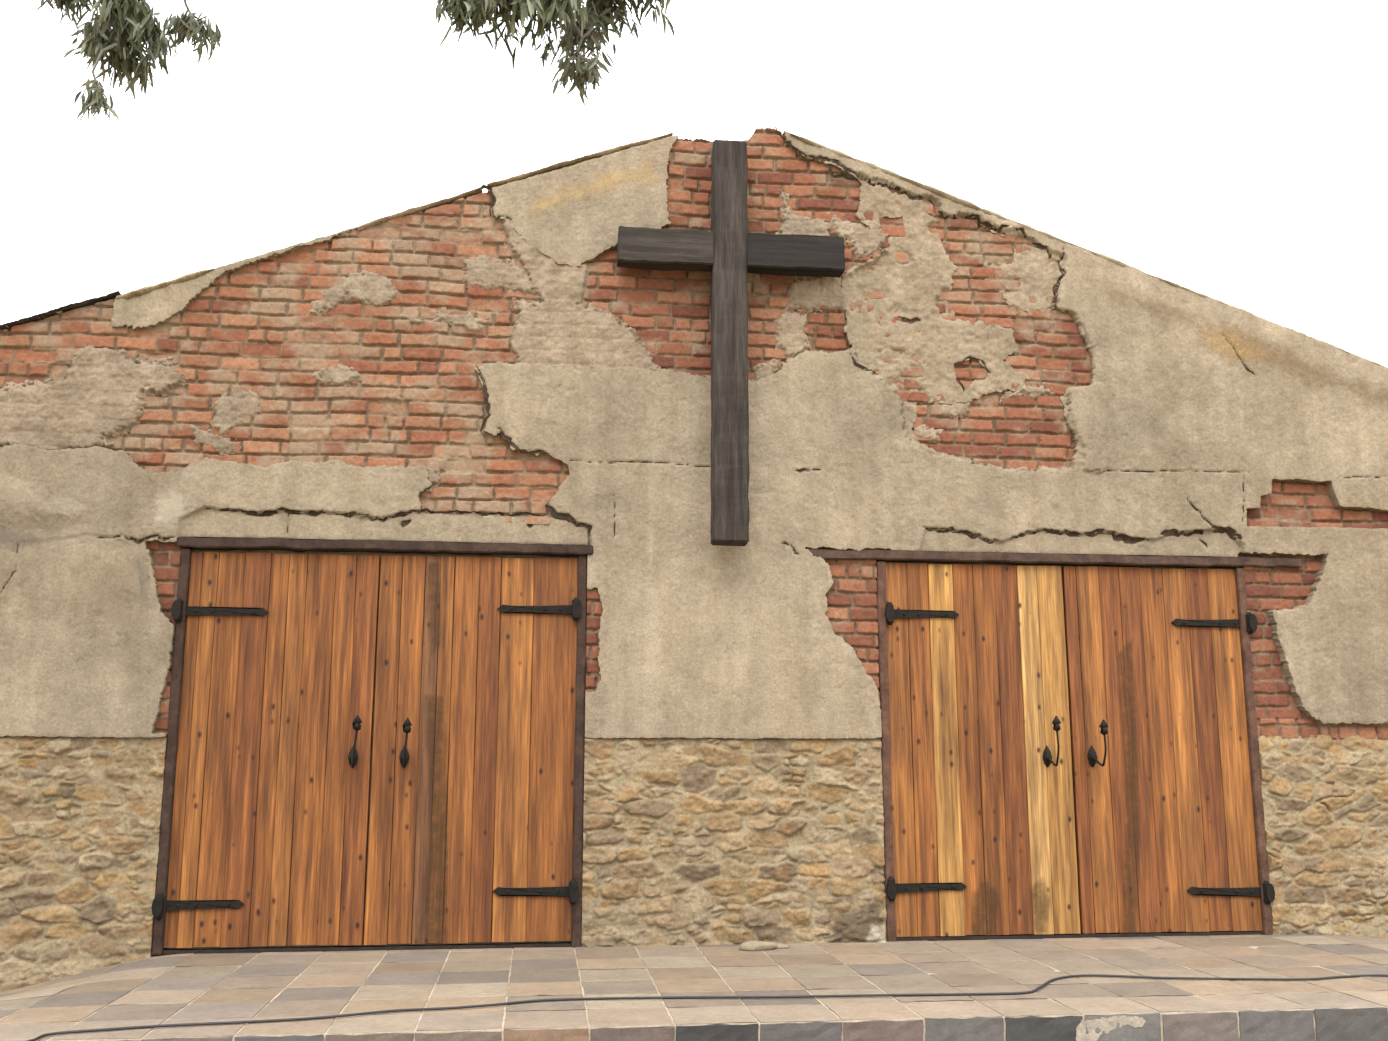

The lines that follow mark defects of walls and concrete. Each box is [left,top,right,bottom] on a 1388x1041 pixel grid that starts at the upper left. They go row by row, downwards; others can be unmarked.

spalling [662,139,713,231]
spalling [732,128,1092,471]
spalling [0,192,711,527]
crack [205,495,616,545]
crack [924,469,1244,547]
spalling [1246,481,1388,529]
spalling [154,642,174,734]
spalling [147,541,182,625]
spalling [805,548,889,700]
spalling [1238,553,1388,739]